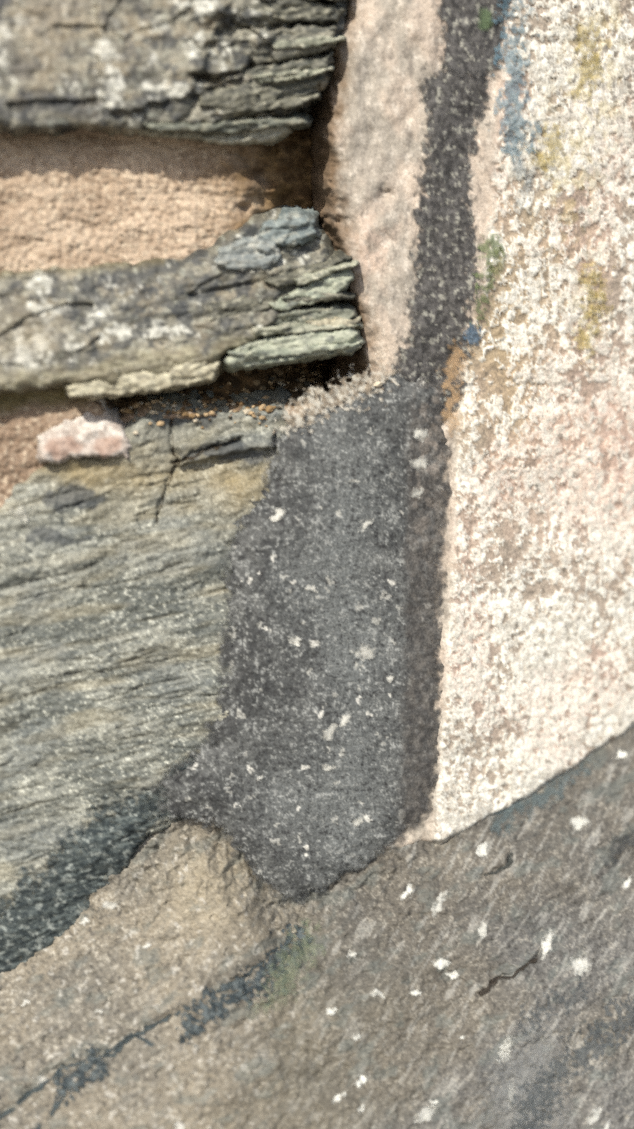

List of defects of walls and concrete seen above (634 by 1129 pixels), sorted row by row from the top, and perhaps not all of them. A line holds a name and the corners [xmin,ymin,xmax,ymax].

leakage [275,0,541,434]
crack [156,420,240,521]